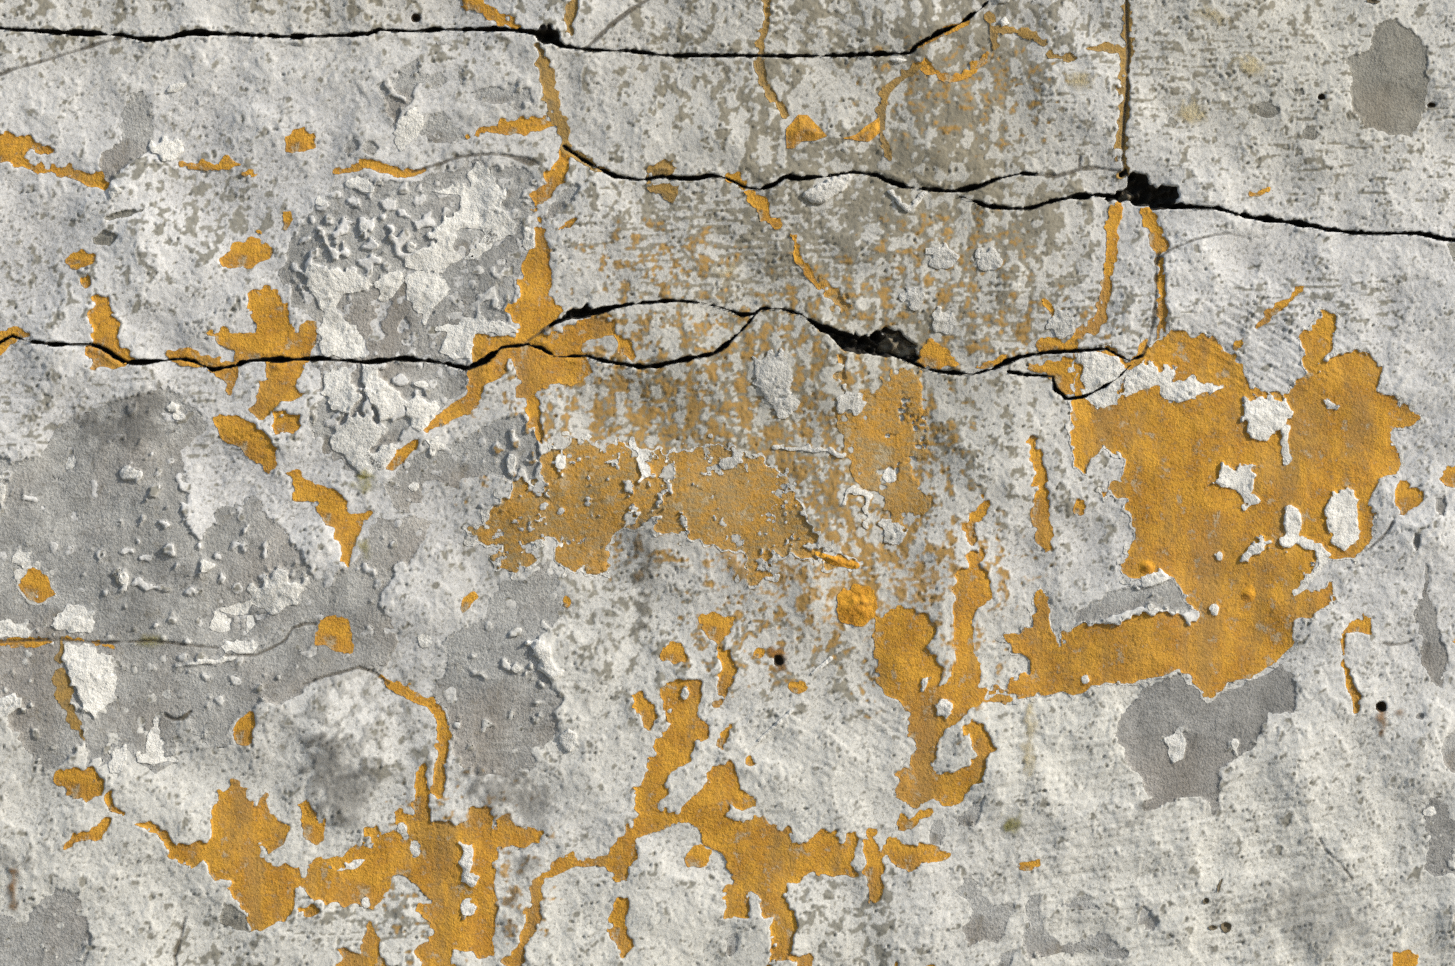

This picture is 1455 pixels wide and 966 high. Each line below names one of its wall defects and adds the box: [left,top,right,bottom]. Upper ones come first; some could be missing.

crack [0,0,989,75]
crack [420,0,1130,210]
flaking render [1340,18,1430,137]
crack [0,202,1455,400]
flaking render [0,0,863,966]
peeling [500,168,1424,966]
flaking render [1413,533,1455,687]
flaking render [1441,731,1455,773]
flaking render [1422,796,1455,876]